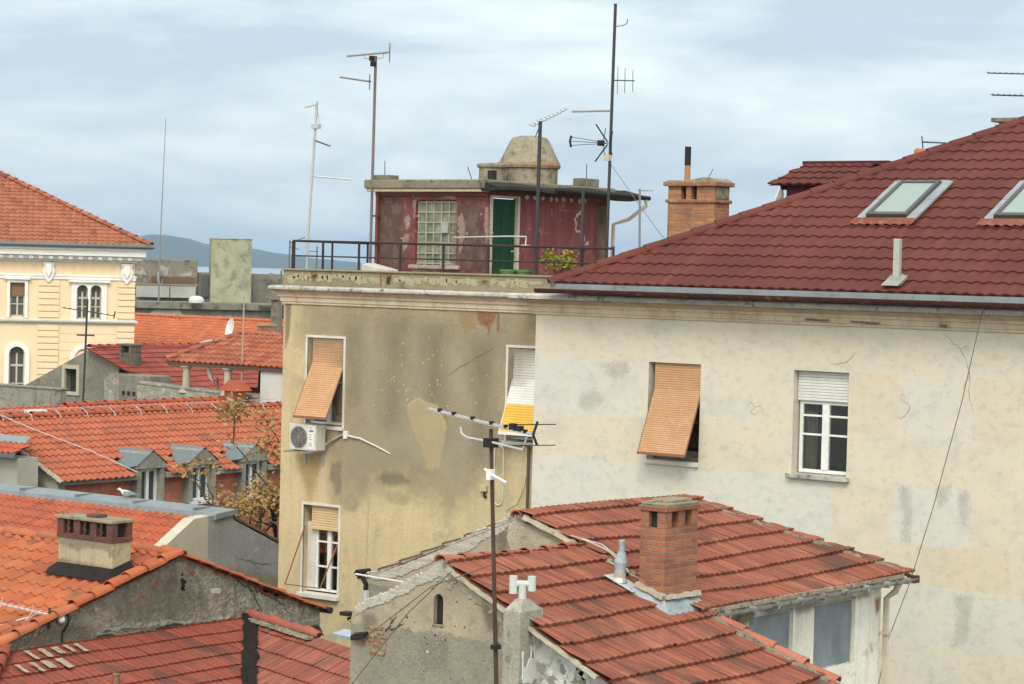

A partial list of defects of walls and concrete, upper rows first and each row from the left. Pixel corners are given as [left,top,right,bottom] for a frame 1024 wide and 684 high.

peeling [401,196,418,250]
peeling [525,195,589,245]
peeling [286,213,541,289]
rust [477,311,499,330]
crack [942,331,973,412]
damp [313,308,535,496]
spalling [357,625,386,663]